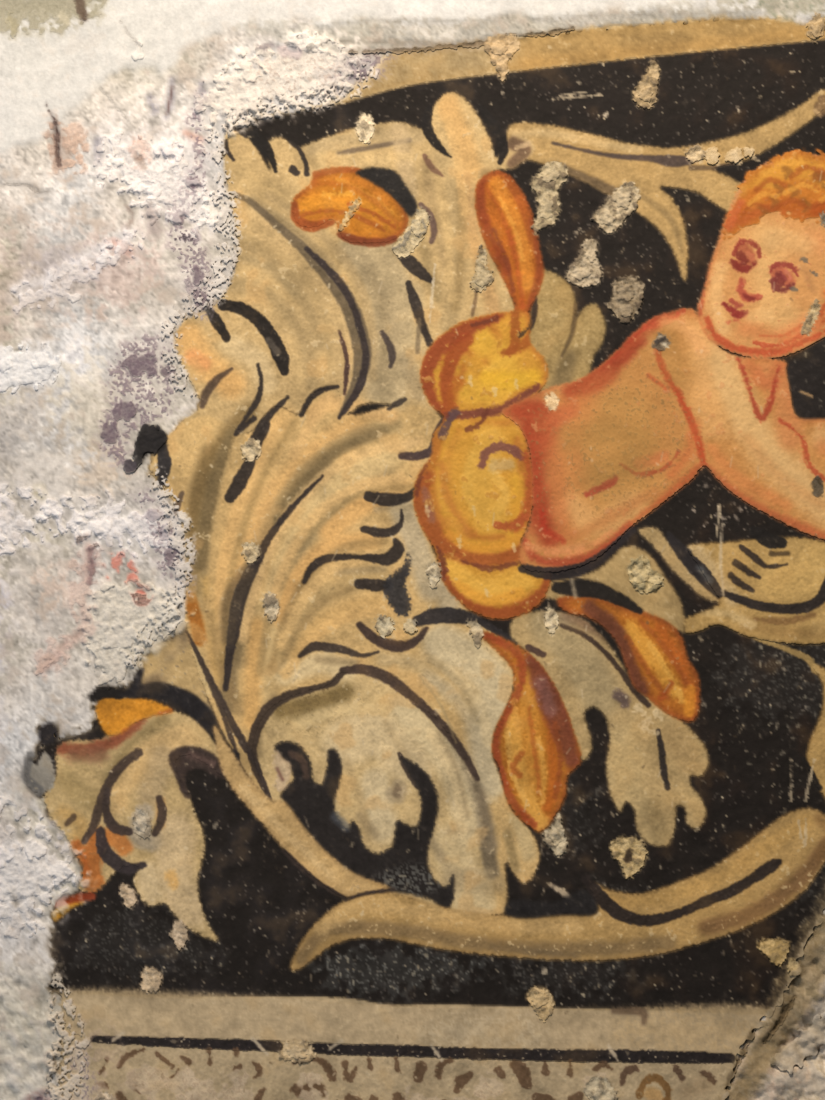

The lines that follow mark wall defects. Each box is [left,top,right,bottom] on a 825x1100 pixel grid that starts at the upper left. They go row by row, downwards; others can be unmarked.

peeling [166,93,212,310]
flaking render [530,161,568,235]
flaking render [565,181,645,323]
peeling [100,334,178,473]
peeling [82,567,183,685]
flaking render [542,813,568,858]
flaking render [610,836,648,879]
flaking render [119,883,137,908]
flaking render [169,921,188,950]
flaking render [140,966,163,993]
flaking render [526,986,555,1022]
flaking render [725,908,825,1100]